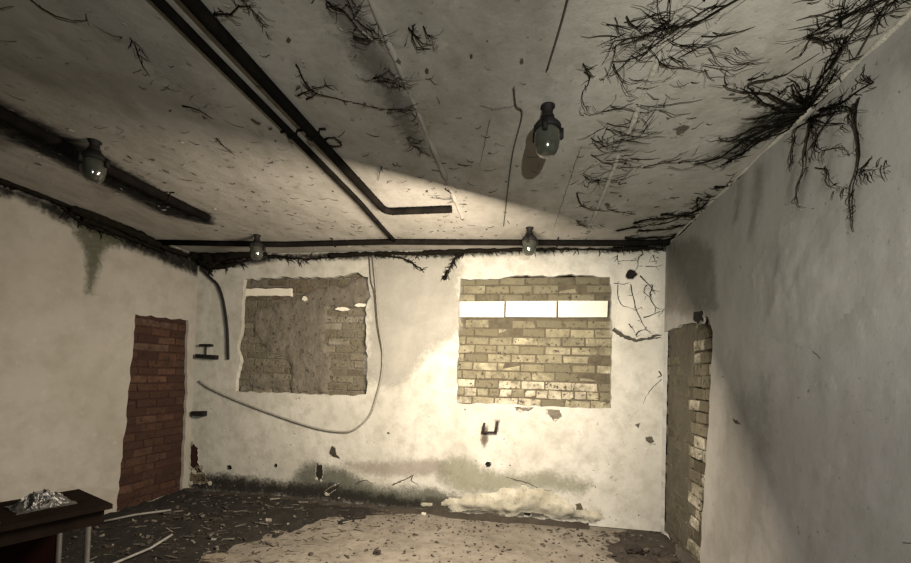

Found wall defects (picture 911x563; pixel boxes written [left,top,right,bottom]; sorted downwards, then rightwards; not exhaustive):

crack [612,327,661,342]
leakage [191,463,505,516]